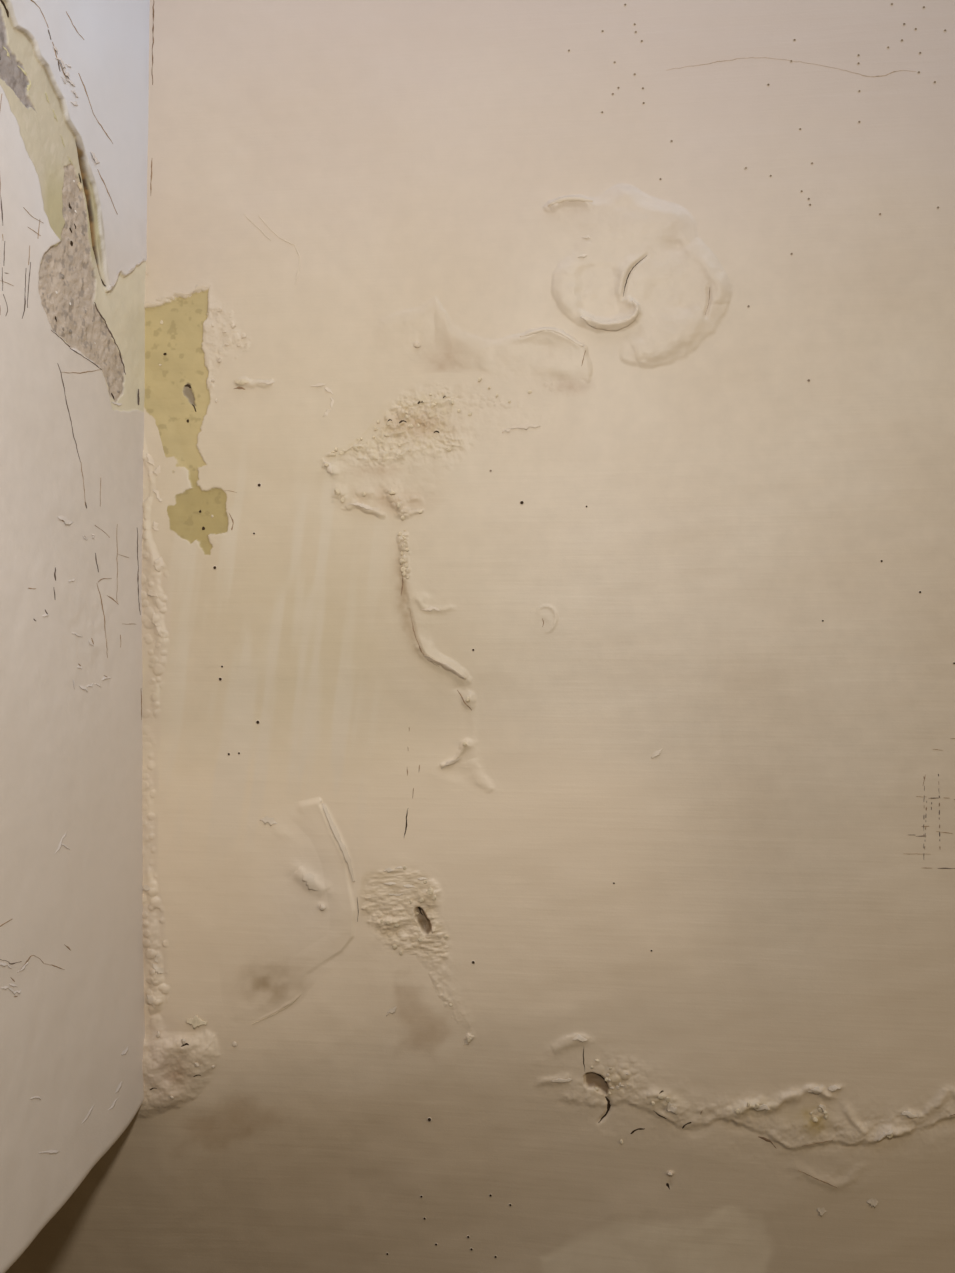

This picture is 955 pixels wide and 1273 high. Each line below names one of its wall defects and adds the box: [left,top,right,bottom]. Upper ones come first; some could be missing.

crack [669,57,907,77]
peeling [0,0,285,561]
flaking render [315,372,568,520]
flaking render [357,856,486,1047]
flaking render [126,1008,237,1132]